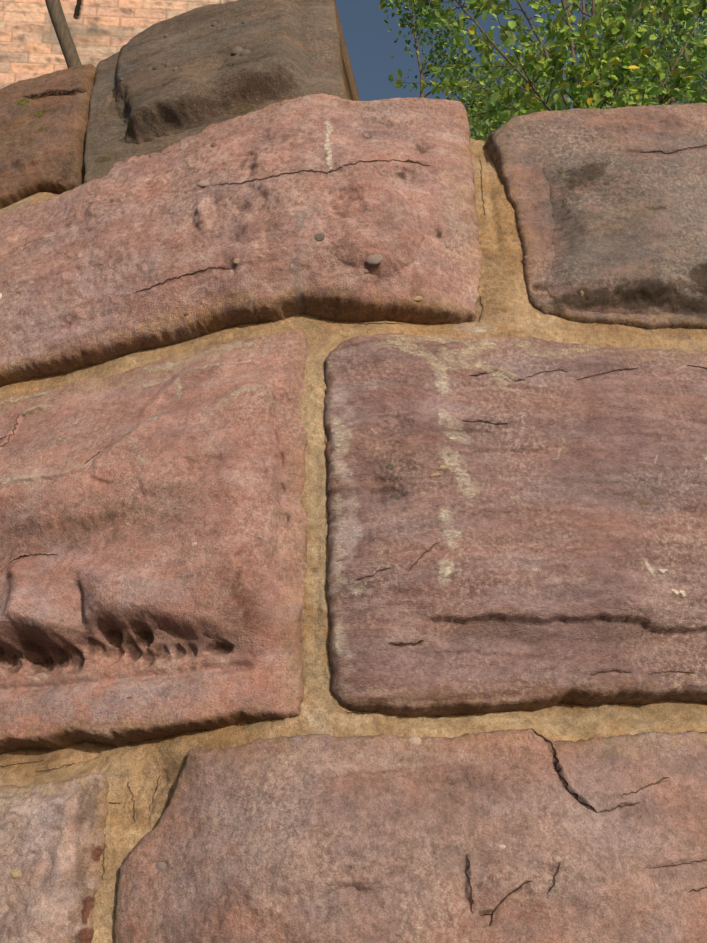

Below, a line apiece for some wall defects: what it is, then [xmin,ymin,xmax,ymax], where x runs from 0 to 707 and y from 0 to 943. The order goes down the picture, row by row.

crack [0,415,19,447]
crack [533,729,670,813]
crack [465,854,560,926]